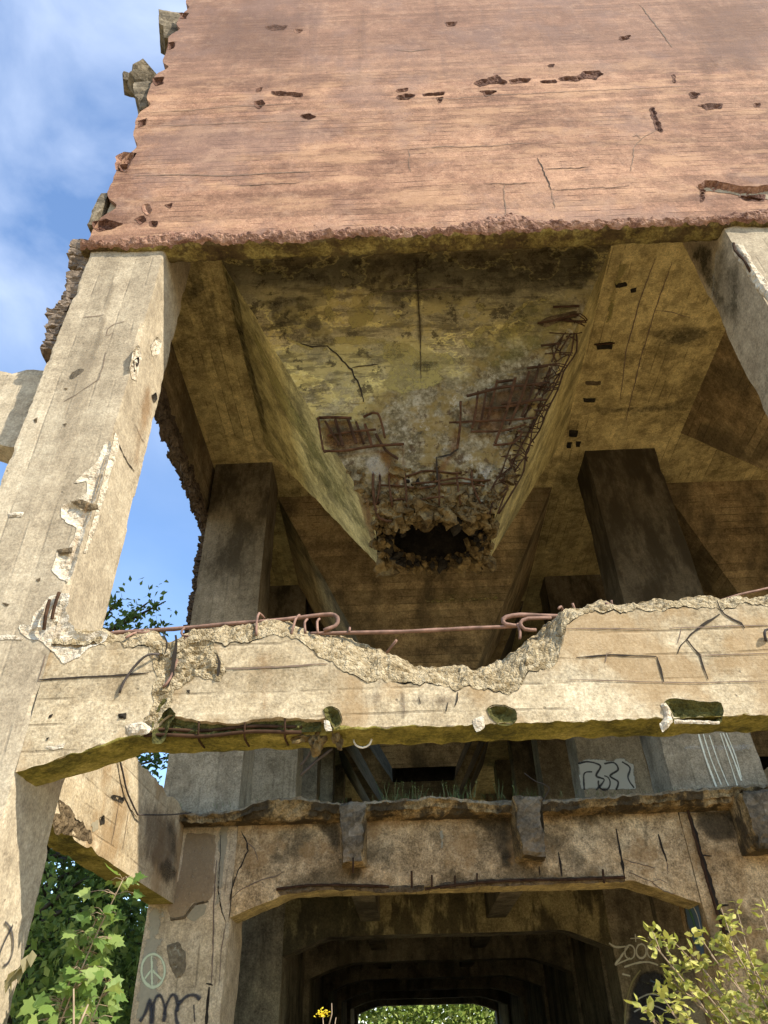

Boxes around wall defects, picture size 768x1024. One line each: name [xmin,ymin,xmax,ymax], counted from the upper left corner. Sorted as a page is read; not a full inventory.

spalling [397,88,445,102]
spalling [474,64,604,97]
spalling [115,152,134,172]
crack [408,130,656,215]
water stain [261,250,594,338]
water stain [226,274,326,471]
crack [300,343,378,402]
spalling [317,288,591,578]
spalling [0,430,768,749]
crack [565,601,768,683]
crack [687,810,730,940]
crack [205,831,283,1024]